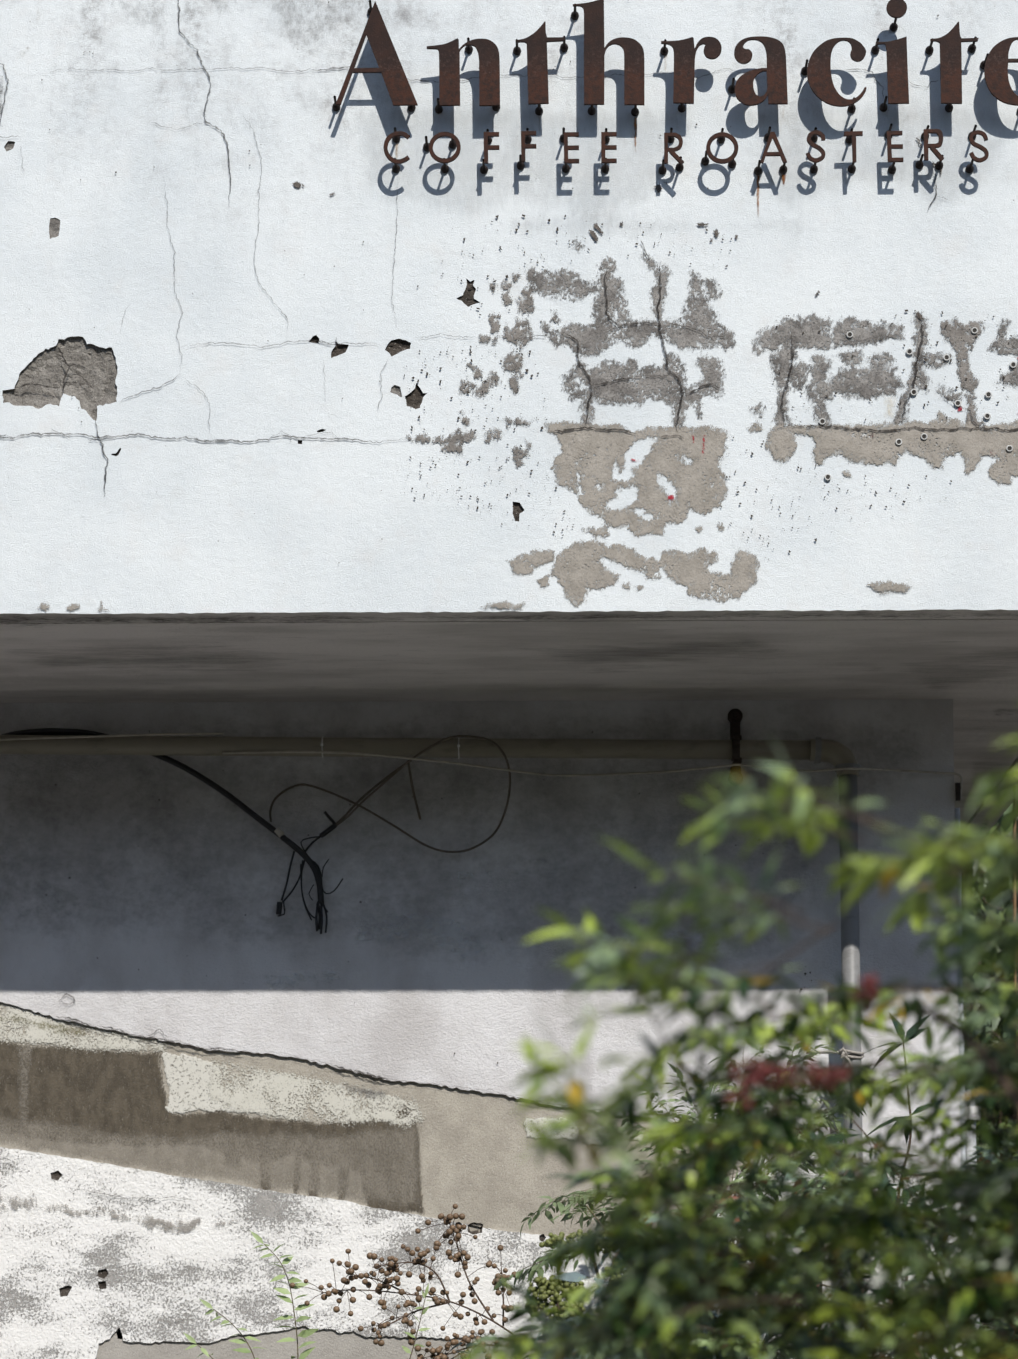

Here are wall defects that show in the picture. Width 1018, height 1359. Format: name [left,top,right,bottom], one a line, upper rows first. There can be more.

crack [0,64,9,122]
crack [178,0,231,205]
crack [15,346,76,391]
flaking render [2,336,118,421]
crack [0,419,408,496]
peeling [405,252,760,607]
crack [524,241,729,439]
peeling [748,311,1018,485]
crack [772,317,1018,439]
peeling [866,580,912,595]
flaking render [0,1002,699,1242]
flaking render [96,1326,545,1359]